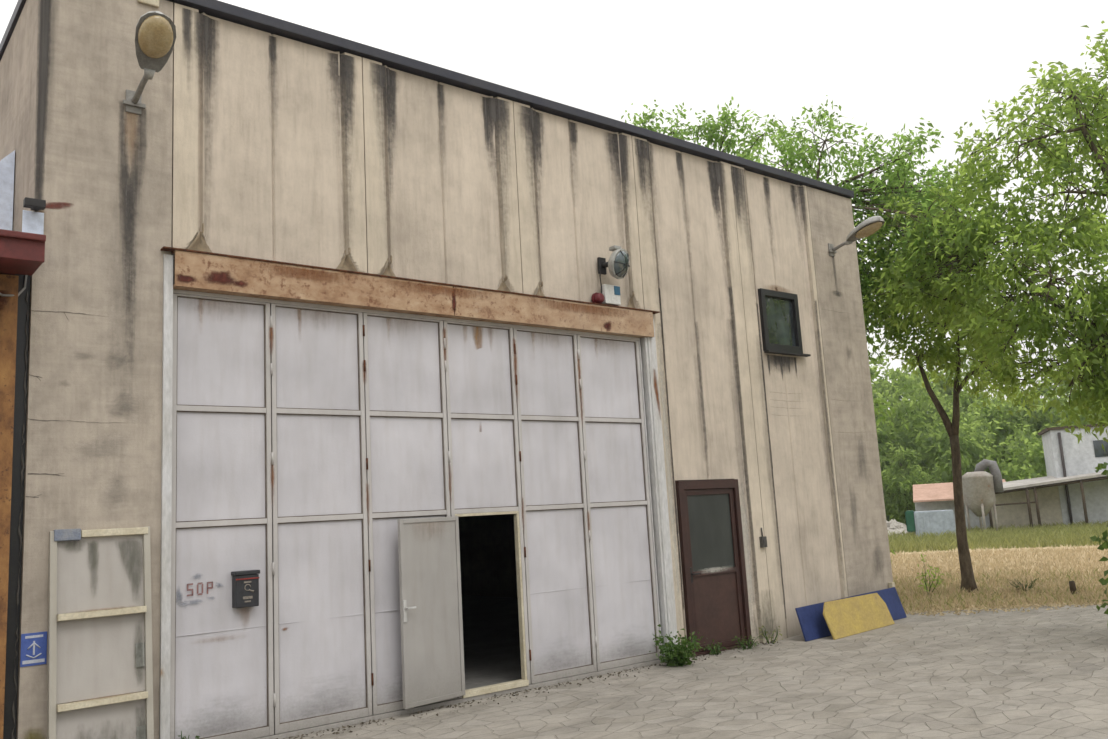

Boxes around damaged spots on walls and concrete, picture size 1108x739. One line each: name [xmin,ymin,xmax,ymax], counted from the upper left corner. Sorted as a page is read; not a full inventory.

leakage [35,0,51,212]
leakage [330,53,352,117]
leakage [373,64,395,122]
leakage [483,97,507,144]
leakage [522,106,540,156]
leakage [609,133,653,183]
leakage [121,109,146,273]
leakage [709,161,745,215]
corrosion [208,272,247,287]
corrosion [418,284,467,311]